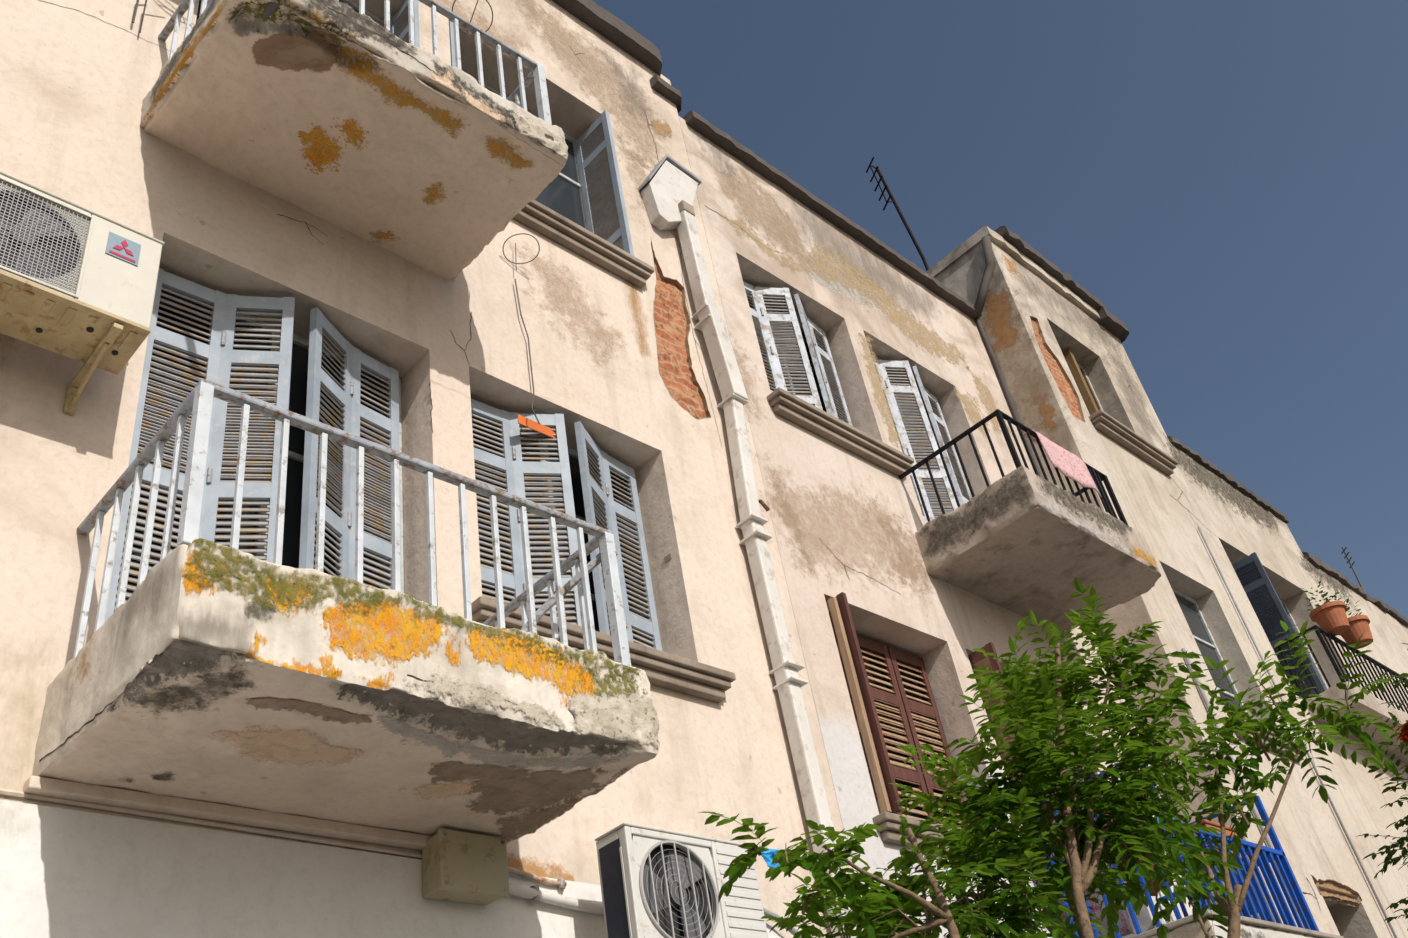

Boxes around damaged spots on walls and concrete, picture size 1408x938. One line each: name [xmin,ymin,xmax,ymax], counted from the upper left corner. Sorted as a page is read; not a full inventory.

spalling [651,241,711,419]
peeling [986,289,1086,431]
leakage [777,472,1132,578]
leakage [123,667,253,713]